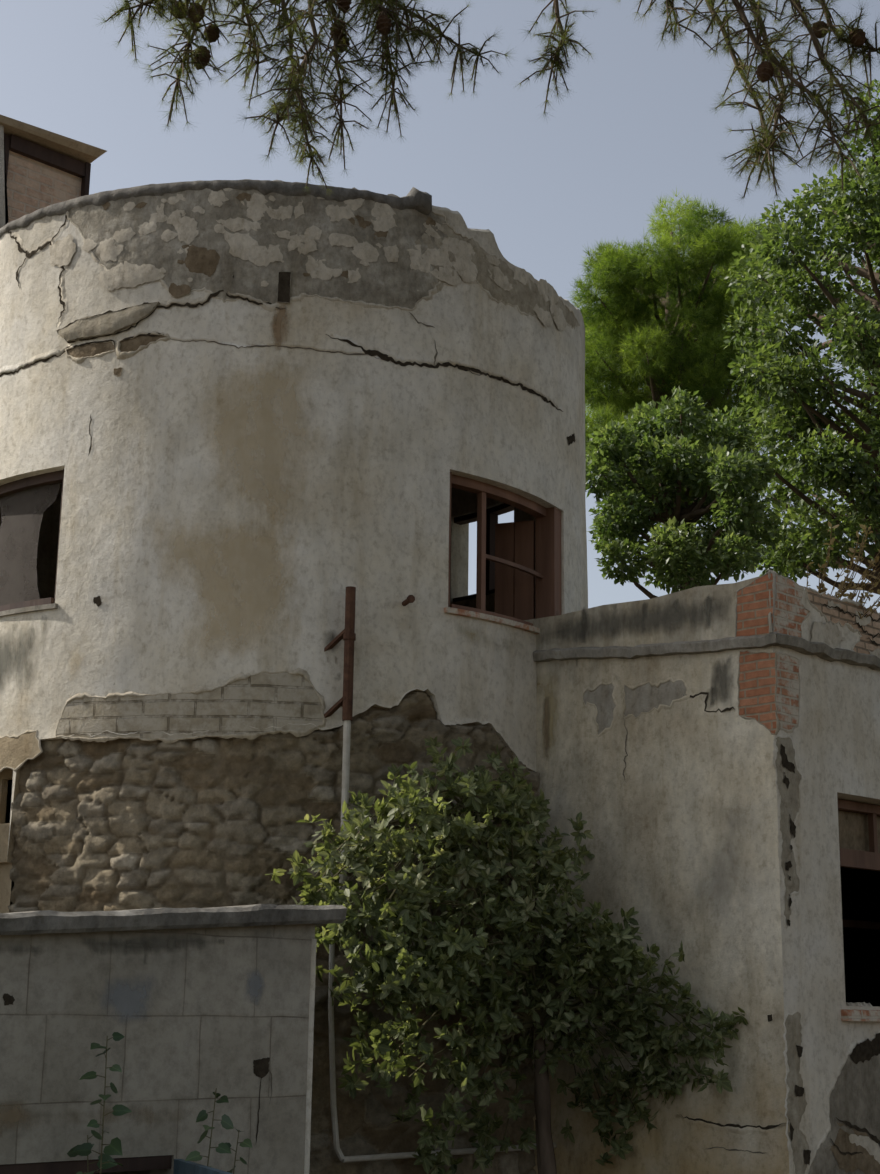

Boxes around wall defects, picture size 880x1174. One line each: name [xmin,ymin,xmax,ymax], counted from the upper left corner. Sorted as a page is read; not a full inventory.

flaking render [49,180,580,330]
crack [0,211,71,377]
crack [153,275,563,412]
damp [555,596,721,641]
damp [0,637,31,686]
spalling [55,667,327,744]
flaking render [582,677,691,738]
flaking render [0,730,43,772]
flaking render [767,1011,880,1174]
crack [675,1115,790,1154]